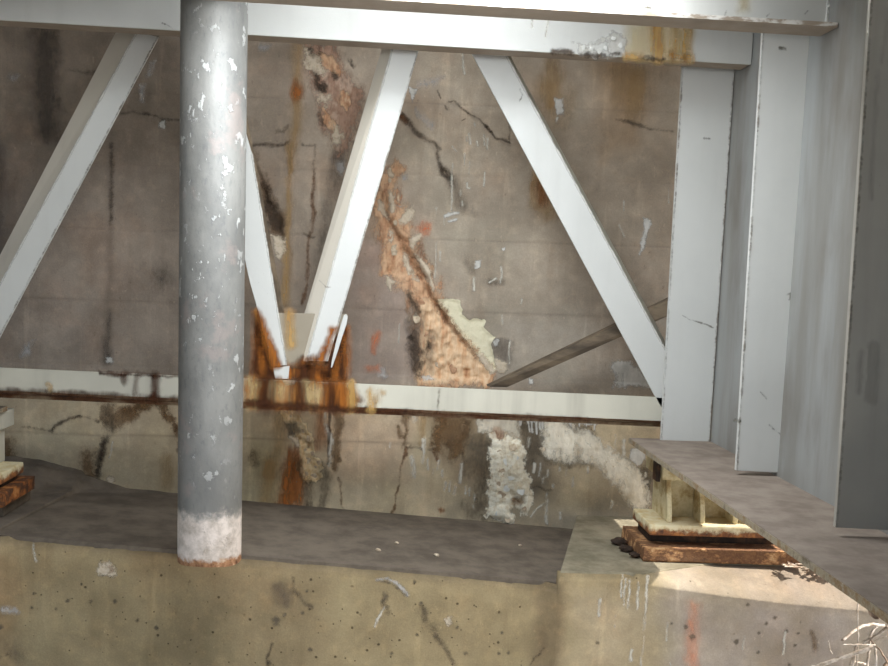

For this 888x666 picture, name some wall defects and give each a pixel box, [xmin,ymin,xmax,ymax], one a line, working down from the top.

spalling [303,44,365,158]
crack [399,114,439,158]
crack [437,91,509,143]
crack [301,176,316,304]
spalling [373,159,507,389]
corrosion [2,389,123,398]
corrosion [99,371,175,401]
corrosion [244,309,420,471]
leakage [96,404,178,484]
corrosion [279,451,304,505]
leakage [410,417,652,524]